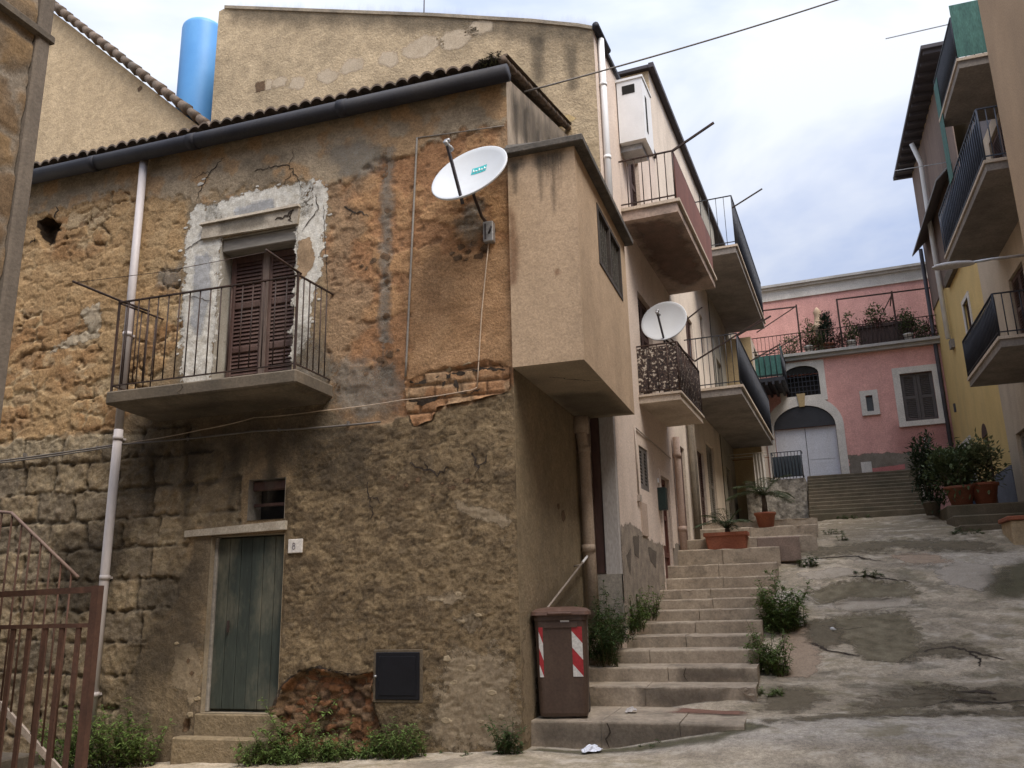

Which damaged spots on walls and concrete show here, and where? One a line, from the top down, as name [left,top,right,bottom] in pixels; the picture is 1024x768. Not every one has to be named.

crack [195,158,223,200]
crack [255,154,301,222]
spalling [29,207,62,245]
peeling [176,178,332,383]
flaking render [404,359,510,427]
flaking render [268,665,383,752]